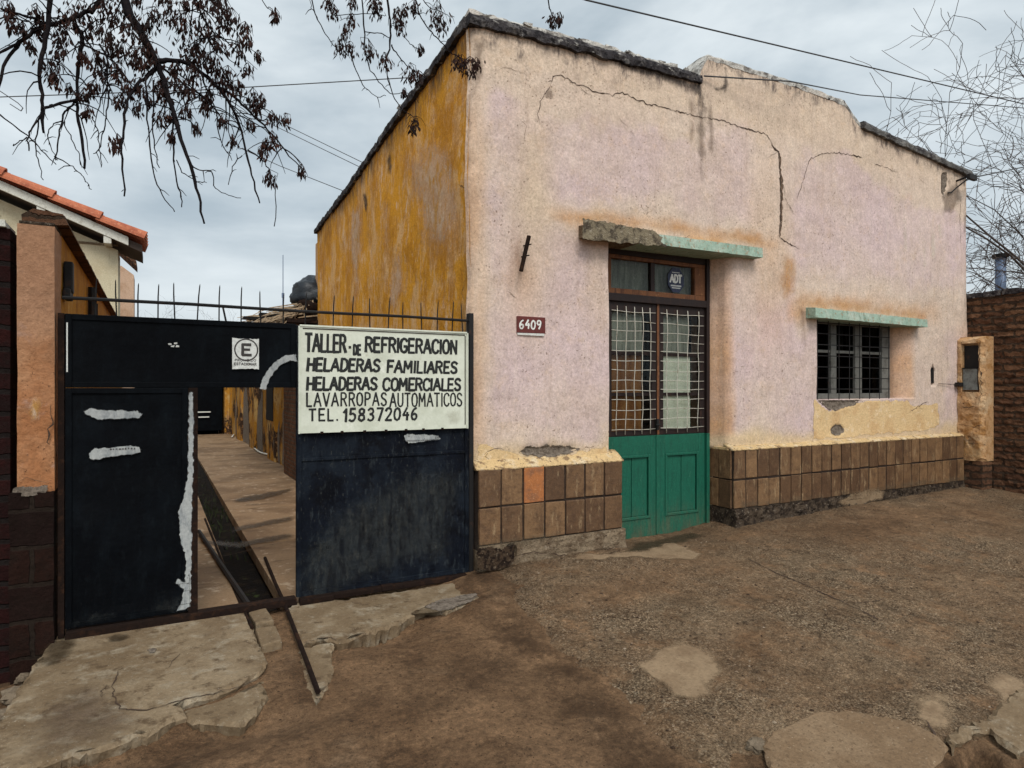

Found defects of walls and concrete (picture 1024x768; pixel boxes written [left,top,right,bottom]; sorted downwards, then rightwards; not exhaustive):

crack [499,67,891,247]
peeling [813,399,939,439]
peeling [477,443,607,461]